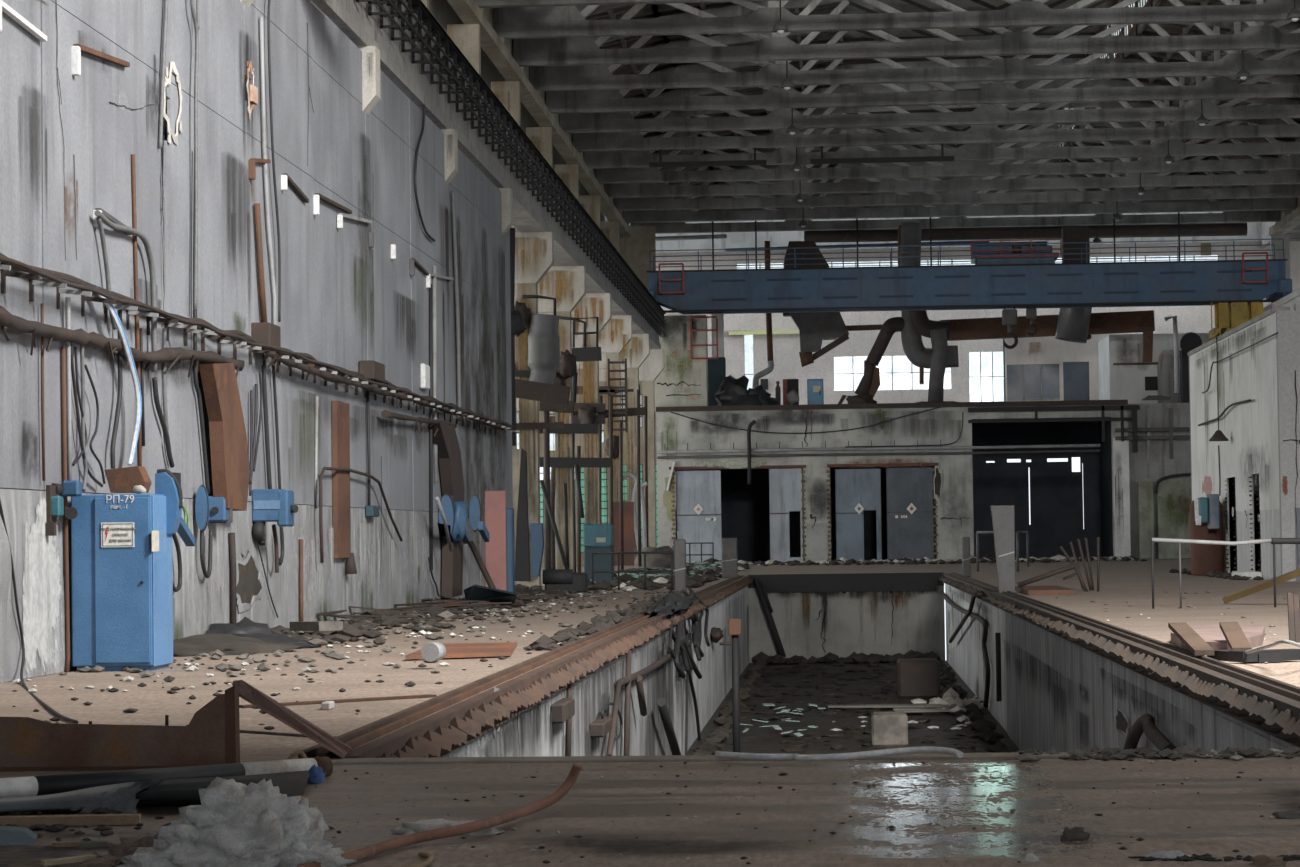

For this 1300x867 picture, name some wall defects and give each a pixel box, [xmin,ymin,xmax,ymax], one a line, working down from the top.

damp [31,91,47,187]
damp [228,155,250,297]
rust [515,238,572,380]
rust [558,298,638,361]
crack [1283,370,1300,553]
spalling [208,548,264,613]